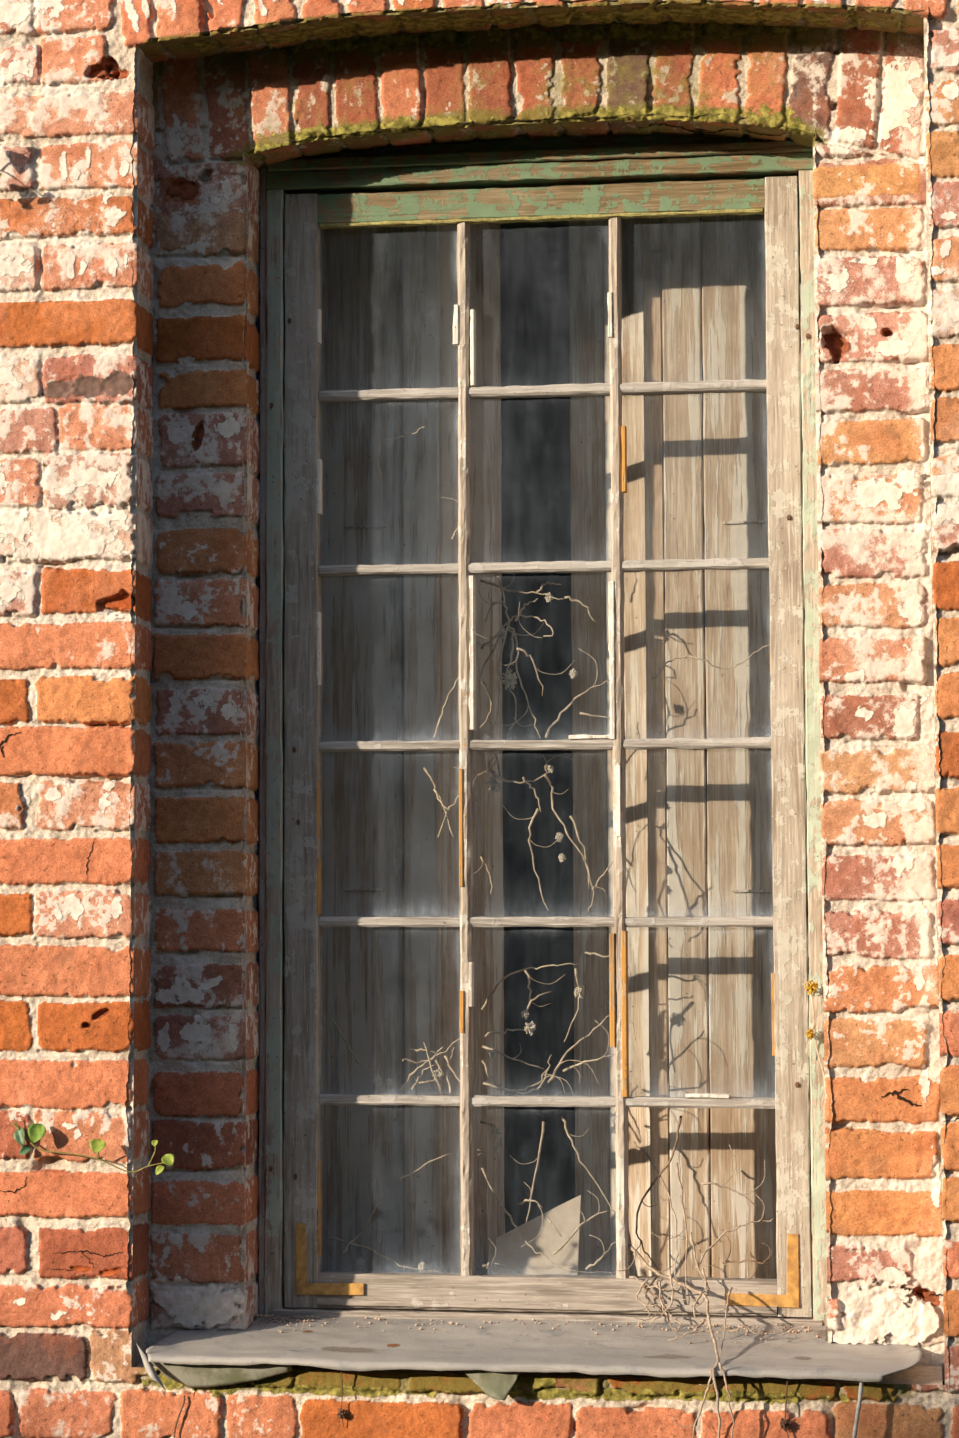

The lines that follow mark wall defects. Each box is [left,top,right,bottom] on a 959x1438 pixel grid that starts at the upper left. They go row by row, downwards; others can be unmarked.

peeling [250,30,477,54]
spalling [90,56,129,80]
peeling [165,114,234,205]
spalling [821,333,850,363]
peeling [859,314,913,357]
spalling [96,593,136,622]
peeling [155,579,199,621]
crack [0,732,21,758]
spalling [82,1009,109,1028]
crack [881,1089,959,1122]
spalling [911,1286,940,1336]